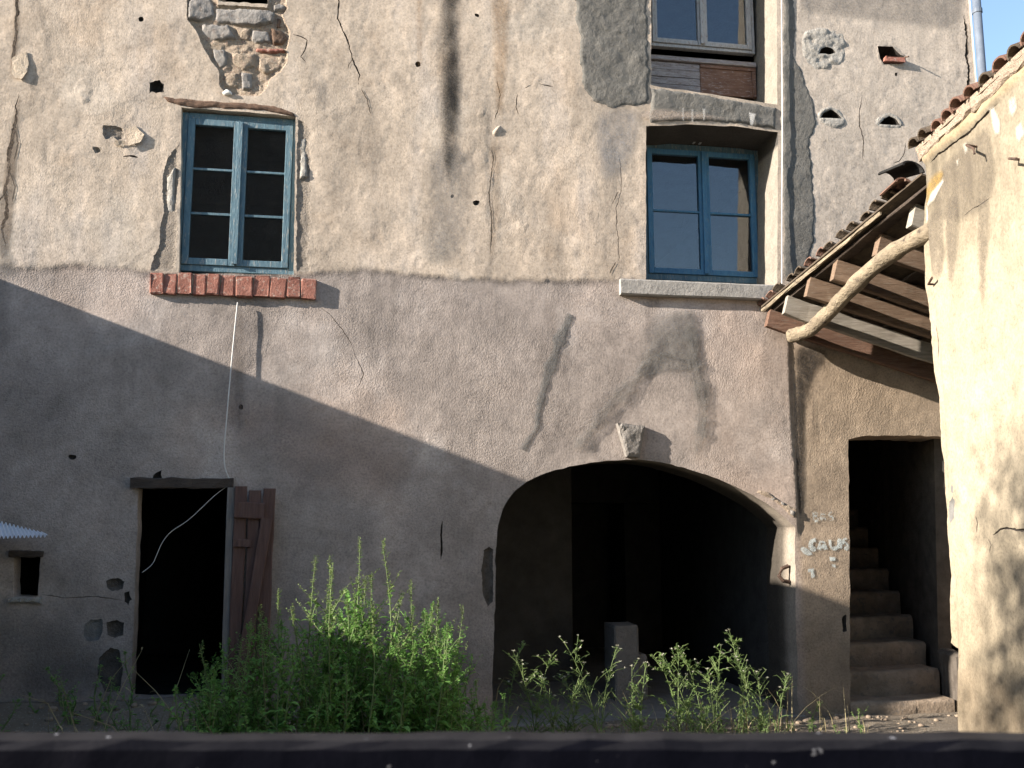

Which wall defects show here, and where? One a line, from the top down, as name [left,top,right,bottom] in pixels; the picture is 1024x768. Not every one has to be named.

crack [0,0,29,248]
spalling [92,125,144,154]
spalling [187,0,290,96]
crack [337,0,371,113]
leakage [439,0,458,169]
crack [495,82,553,118]
spalling [802,28,846,69]
crack [487,150,495,256]
crack [976,518,1024,553]
spalling [106,578,132,605]
spalling [84,619,124,692]